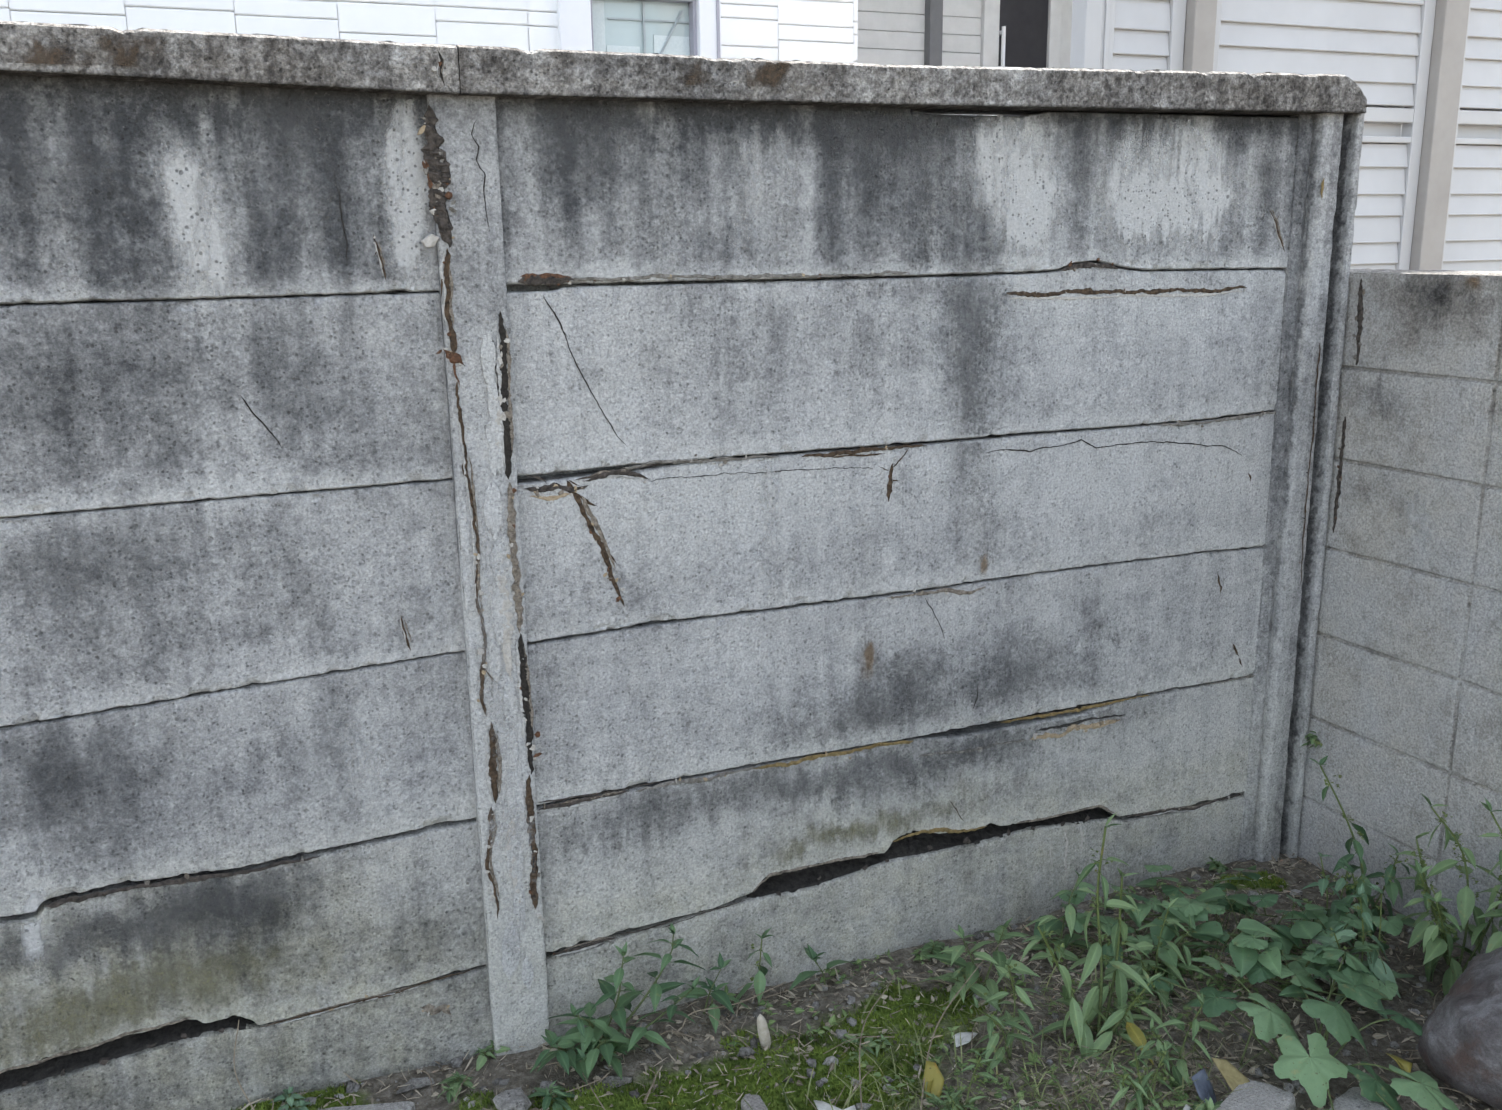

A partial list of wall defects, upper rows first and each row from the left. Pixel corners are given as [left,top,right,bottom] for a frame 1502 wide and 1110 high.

damp [160,149,230,292]
damp [385,100,429,277]
crack [471,121,489,227]
damp [975,118,1058,254]
damp [1104,123,1234,248]
crack [1006,285,1247,301]
crack [544,298,869,607]
crack [439,248,658,919]
damp [22,893,44,958]